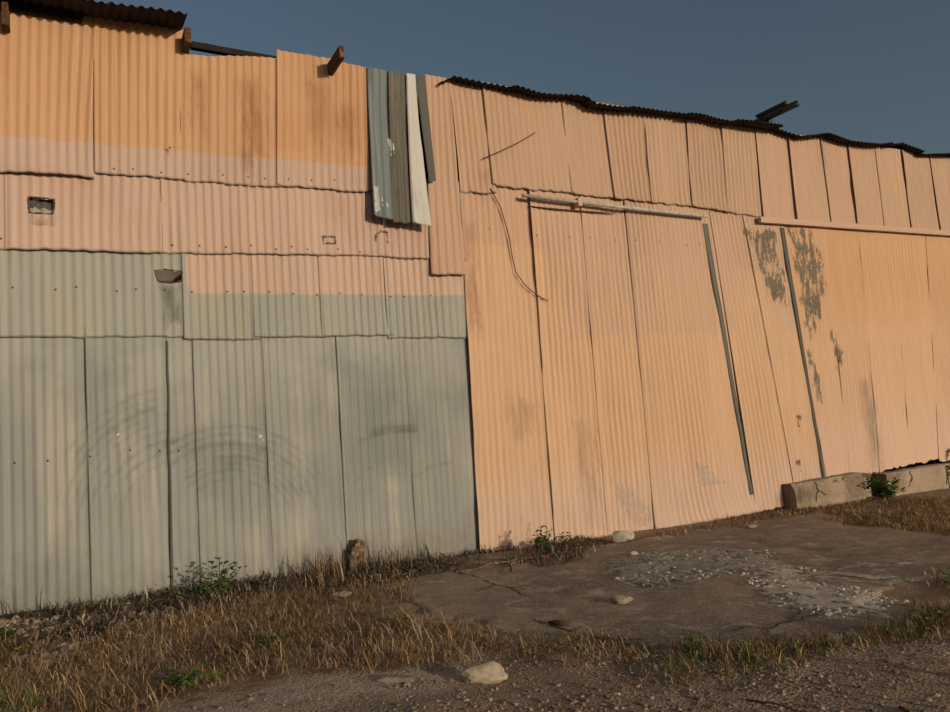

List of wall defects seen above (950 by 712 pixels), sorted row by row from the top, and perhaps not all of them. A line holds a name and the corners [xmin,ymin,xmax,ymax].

peeling [743,226,827,403]
peeling [830,330,843,367]
crack [731,612,817,635]